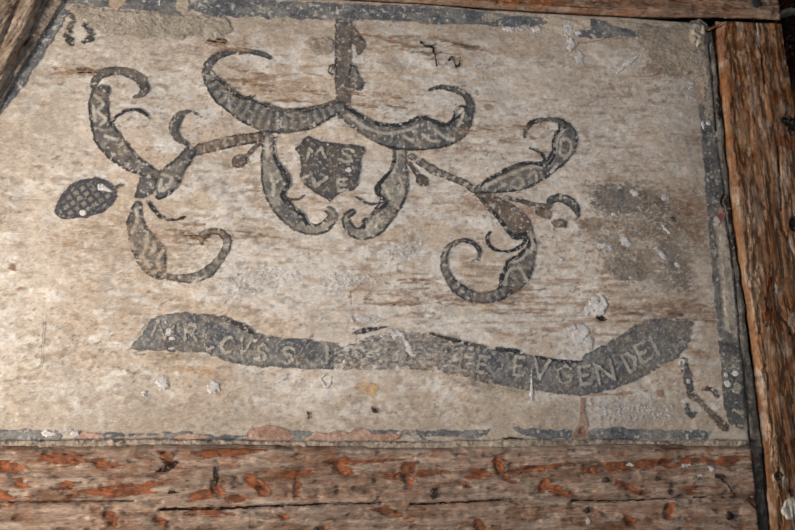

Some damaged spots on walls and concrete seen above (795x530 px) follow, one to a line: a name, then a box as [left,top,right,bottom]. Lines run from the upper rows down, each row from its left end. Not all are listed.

flaking render [190,425,402,462]